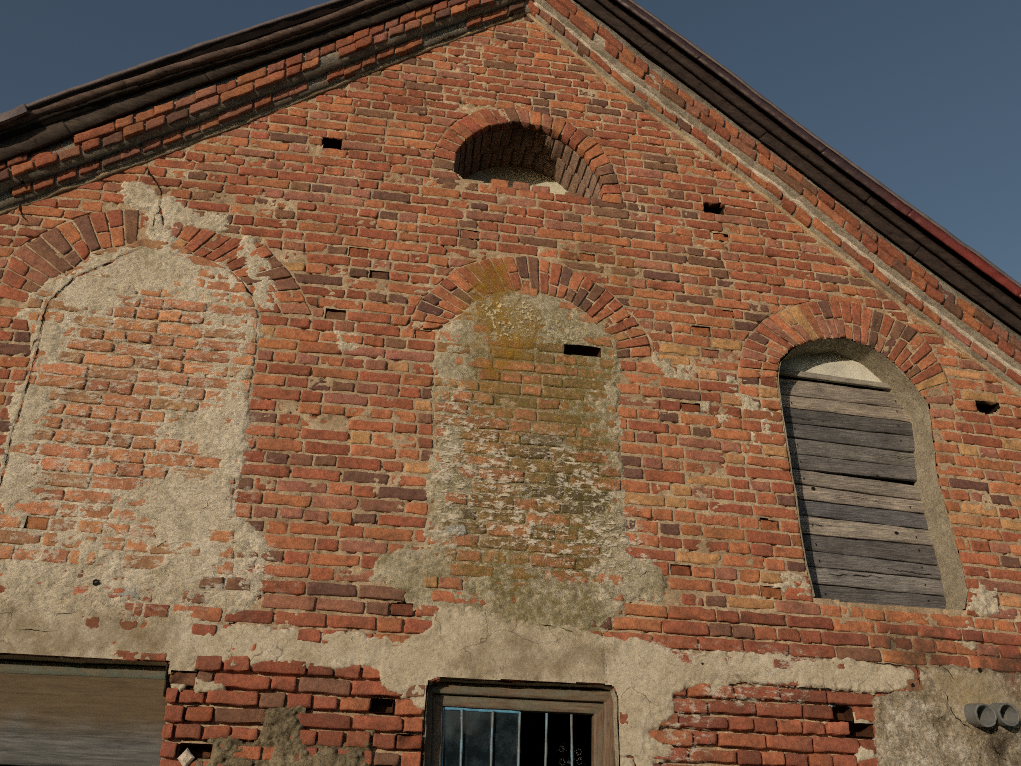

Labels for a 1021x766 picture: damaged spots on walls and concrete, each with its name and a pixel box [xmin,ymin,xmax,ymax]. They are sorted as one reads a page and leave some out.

crack [19,153,28,222]
crack [147,164,163,224]
crack [0,248,141,485]
peeling [0,244,915,766]
water stain [436,388,648,593]